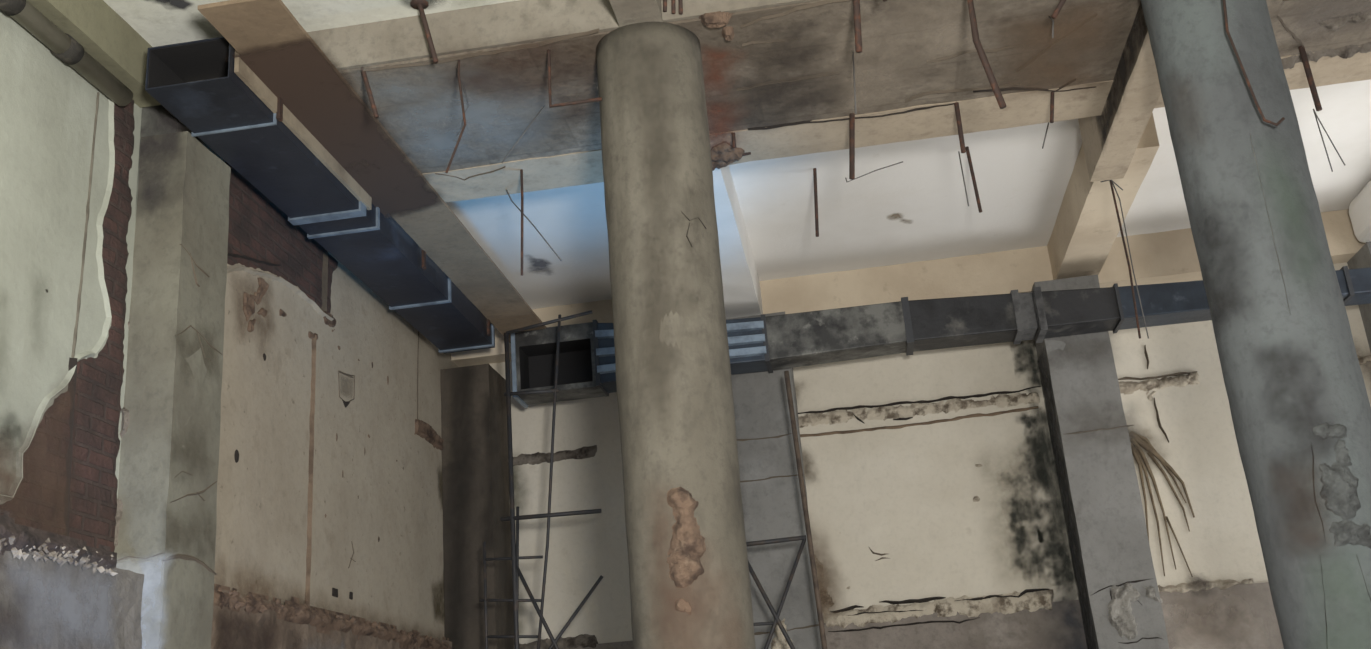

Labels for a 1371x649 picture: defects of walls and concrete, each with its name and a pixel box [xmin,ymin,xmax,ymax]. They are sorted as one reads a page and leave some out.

leakage [155,0,191,9]
crack [363,28,599,135]
crack [435,166,505,181]
spalling [711,141,751,171]
flaking render [225,161,341,350]
peeling [0,98,135,570]
leakage [1016,339,1042,386]
leakage [0,391,71,535]
spalling [667,487,706,615]
peeling [934,588,1054,617]
leakage [1010,406,1075,599]
spalling [1312,422,1371,549]